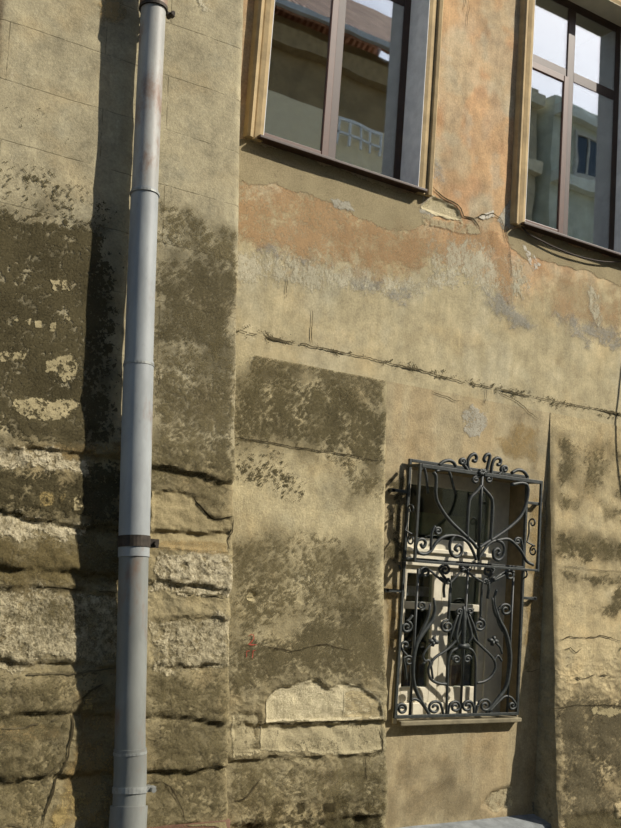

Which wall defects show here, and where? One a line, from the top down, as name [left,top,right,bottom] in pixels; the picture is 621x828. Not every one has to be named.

crack [434,188,512,275]
damp [0,159,125,590]
crack [240,311,621,415]
flaking render [0,445,89,477]
flaking render [0,509,90,544]
flaking render [150,490,233,597]
damp [147,201,412,828]
damp [555,530,621,620]
flaking render [0,582,118,674]
flaking render [149,609,231,676]
crack [43,684,103,825]
damp [557,690,621,828]